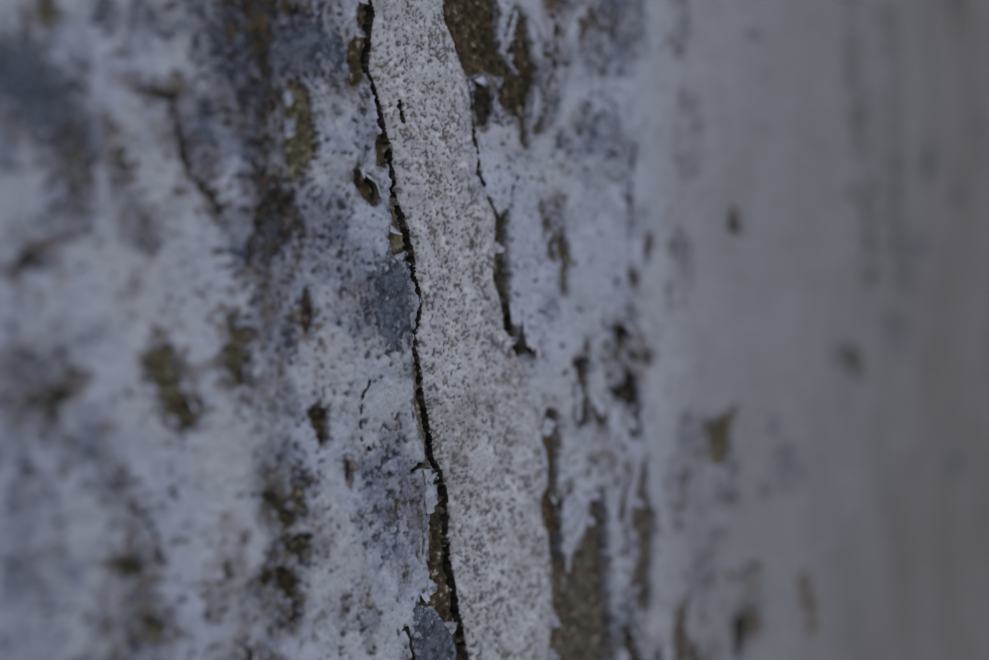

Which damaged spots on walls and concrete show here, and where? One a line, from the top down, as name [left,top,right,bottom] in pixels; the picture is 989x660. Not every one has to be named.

spalling [244,78,319,272]
crack [456,56,519,214]
peeling [443,0,540,148]
peeling [140,342,201,431]
crack [361,0,470,660]
peeling [411,348,462,660]
peeling [493,182,543,365]
peeling [542,224,568,289]
peeling [540,410,653,660]
peeling [573,348,648,437]
spalling [704,406,733,466]
peeling [620,605,699,660]